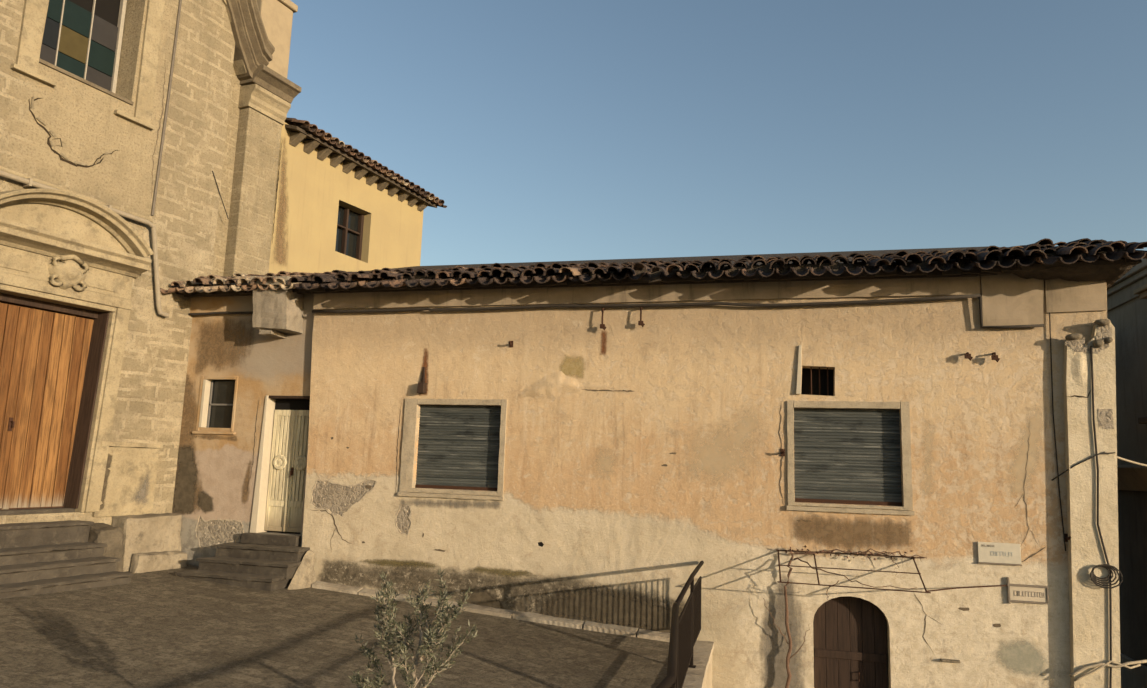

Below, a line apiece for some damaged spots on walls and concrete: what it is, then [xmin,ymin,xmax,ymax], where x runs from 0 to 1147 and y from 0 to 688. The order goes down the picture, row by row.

crack [29,95,120,168]
corrosion [419,350,428,395]
spalling [310,479,377,517]
spalling [195,515,244,549]
crack [312,510,352,550]
spalling [395,504,424,537]
water stain [320,560,685,633]